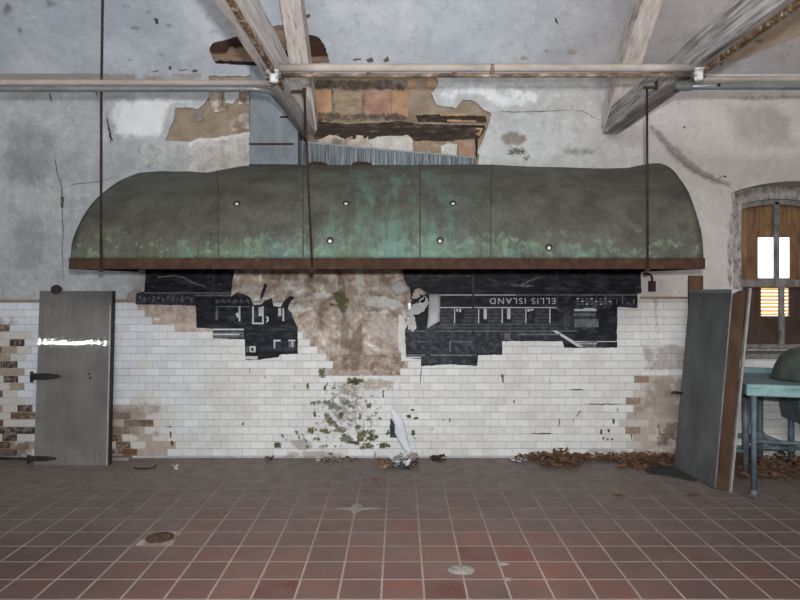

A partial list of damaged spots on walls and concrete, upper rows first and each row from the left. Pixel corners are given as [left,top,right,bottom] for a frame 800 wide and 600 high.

flaking render [166,92,250,142]
flaking render [302,78,491,164]
crack [668,148,734,190]
crack [53,150,114,278]
peeling [231,269,410,376]
spalling [0,325,36,456]
leakage [657,424,677,445]